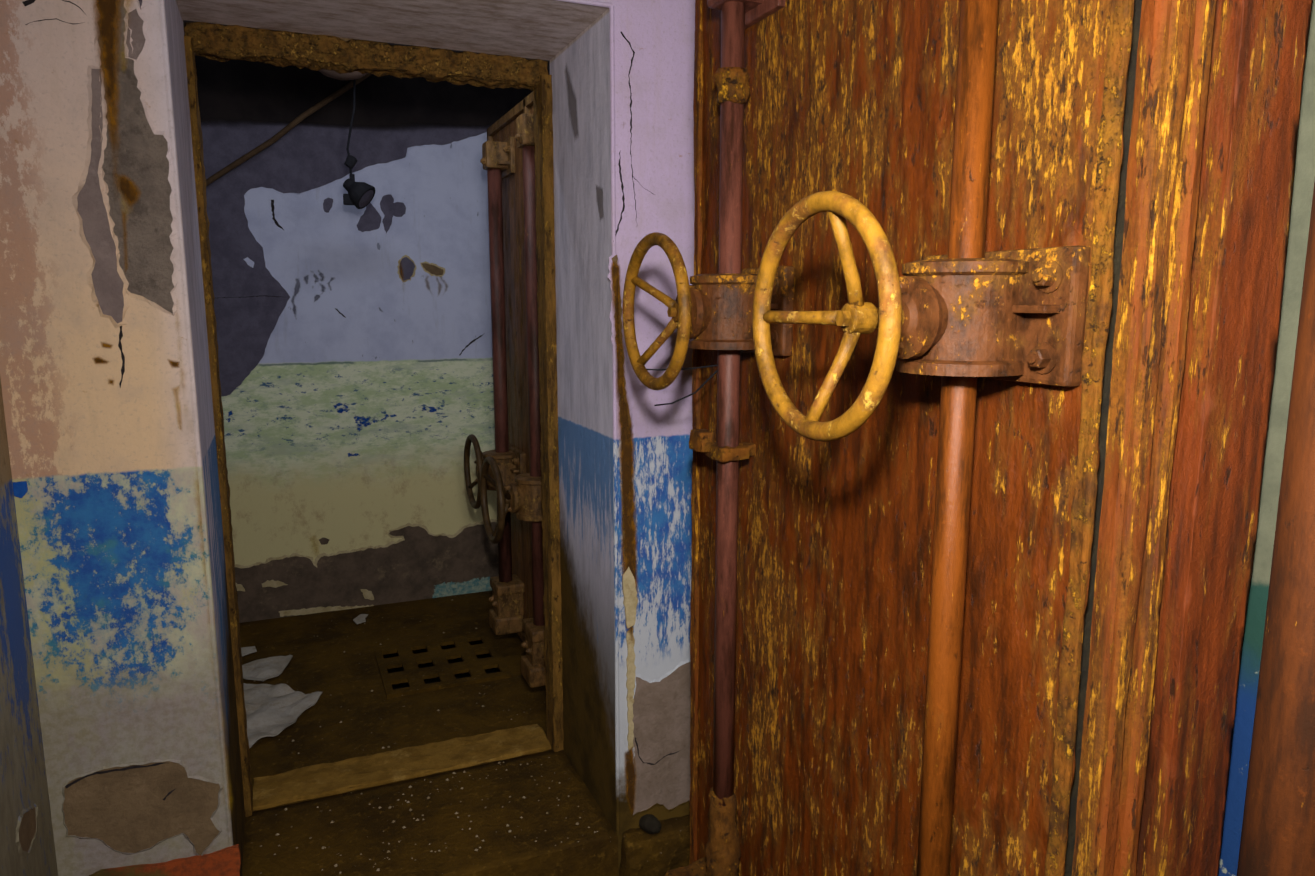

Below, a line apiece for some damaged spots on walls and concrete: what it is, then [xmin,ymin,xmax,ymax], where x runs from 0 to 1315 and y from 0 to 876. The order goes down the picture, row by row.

rust [96,0,119,143]
spalling [72,0,179,388]
rust [118,176,140,267]
peeling [195,55,533,398]
peeling [13,481,28,498]
spalling [235,519,499,623]
spalling [61,759,223,856]